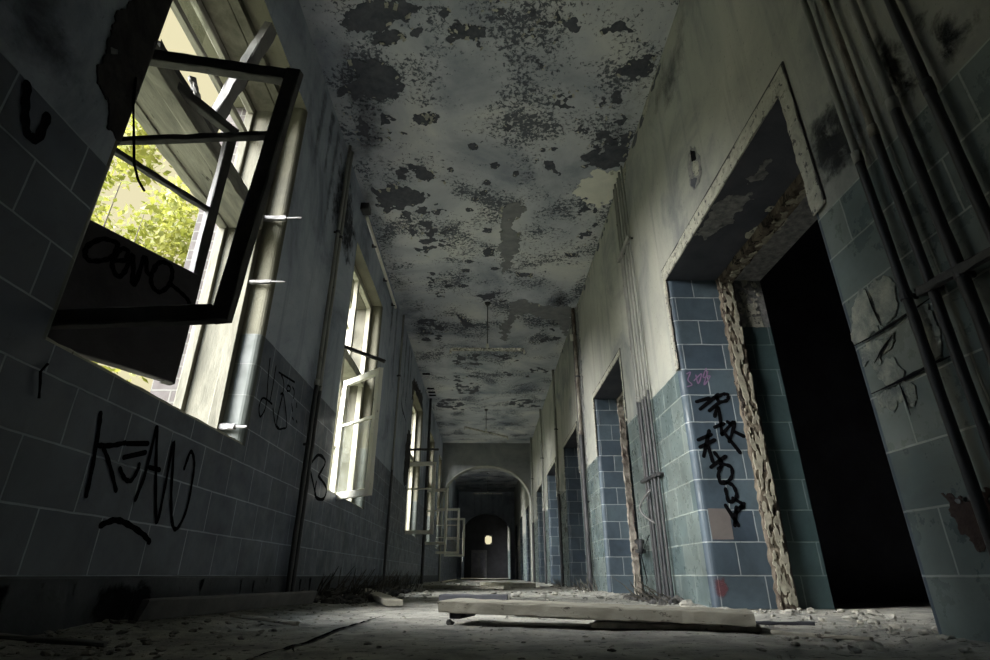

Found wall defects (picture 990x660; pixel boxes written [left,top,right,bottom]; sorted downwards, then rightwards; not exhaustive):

peeling [338,0,423,47]
peeling [438,8,486,50]
peeling [599,20,641,42]
spalling [96,0,173,145]
peeling [336,58,407,142]
peeling [412,111,440,126]
leakage [812,104,862,181]
peeling [371,164,454,257]
peeling [476,54,661,468]
crack [853,289,930,363]
peeling [718,185,806,607]
crack [871,356,951,415]